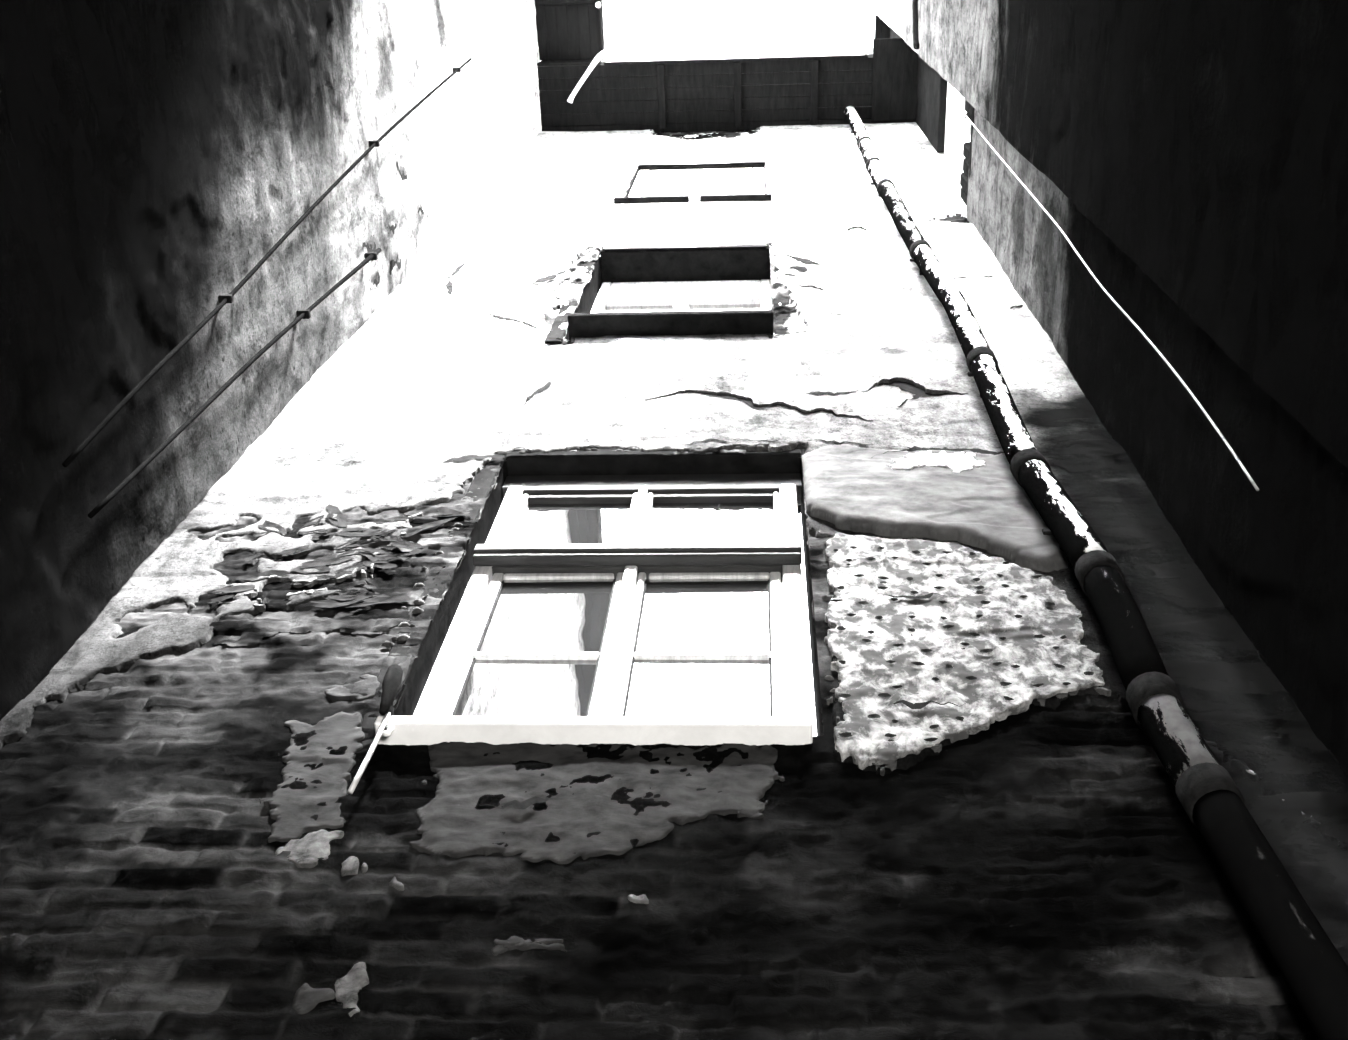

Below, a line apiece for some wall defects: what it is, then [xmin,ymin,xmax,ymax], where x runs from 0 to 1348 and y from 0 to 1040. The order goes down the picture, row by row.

spalling [533,246,605,347]
spalling [766,242,809,339]
crack [643,347,1004,457]